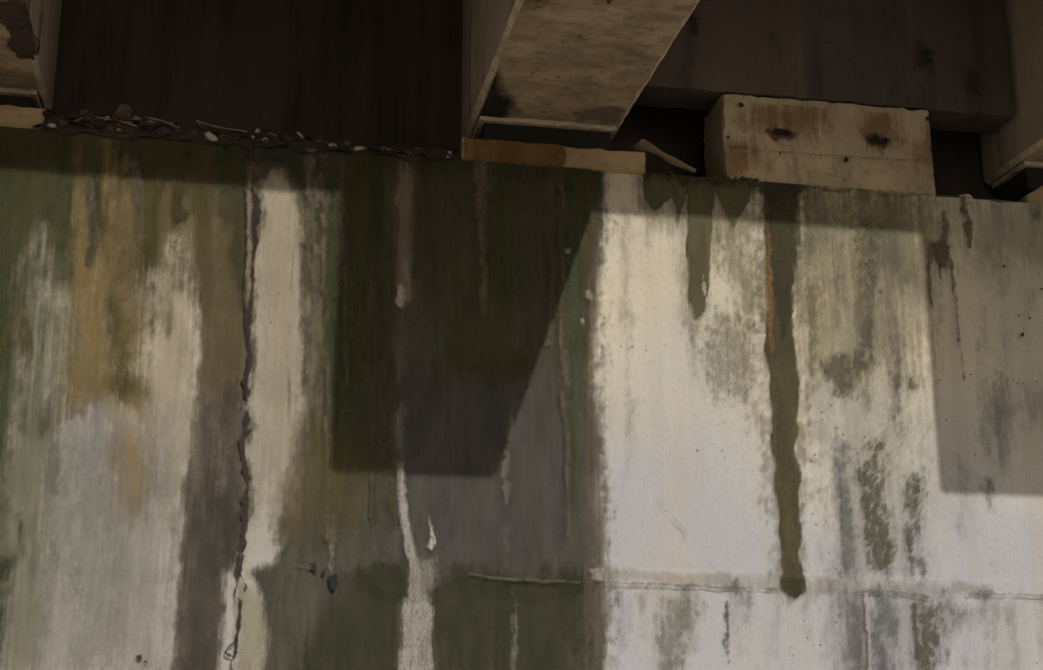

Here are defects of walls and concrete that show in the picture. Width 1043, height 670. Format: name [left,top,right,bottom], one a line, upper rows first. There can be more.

crack [224,144,262,670]
damp [0,126,618,670]
damp [643,174,930,598]